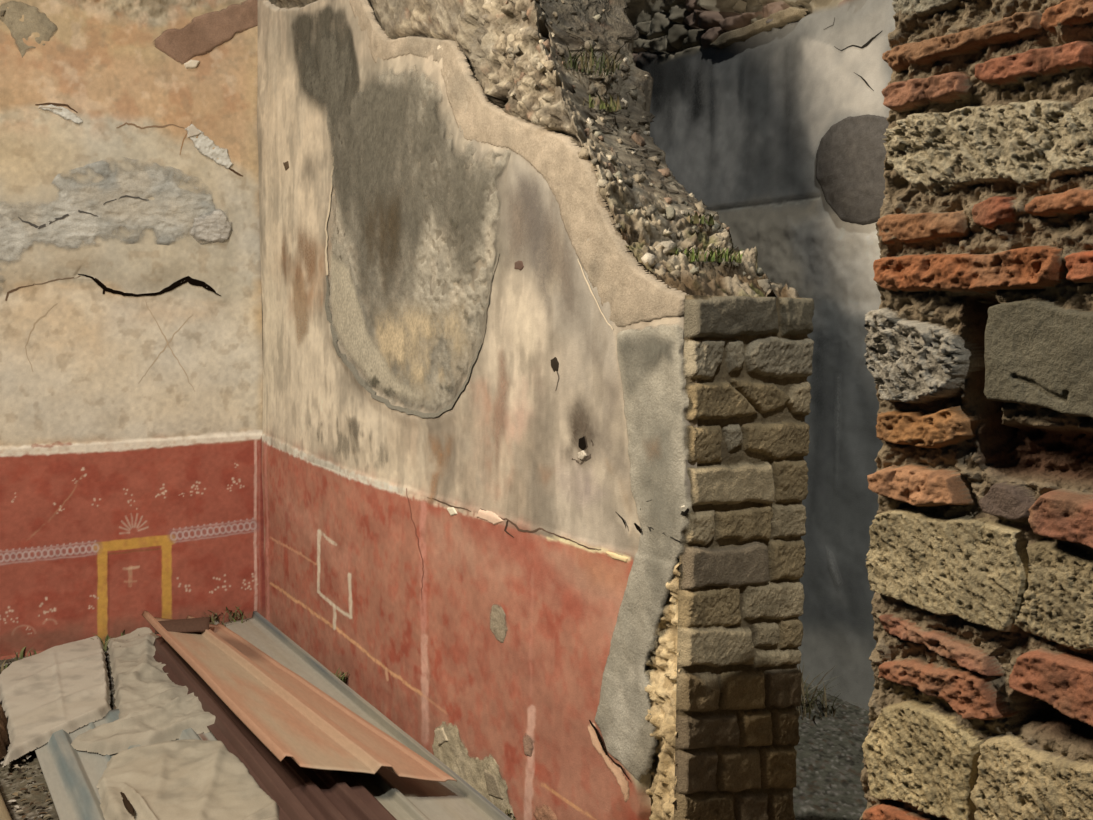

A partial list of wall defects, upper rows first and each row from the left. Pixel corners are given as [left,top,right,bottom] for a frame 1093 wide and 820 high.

spalling [0,1,58,58]
spalling [155,0,258,69]
spalling [0,159,233,261]
spalling [300,32,512,418]
crack [5,274,221,390]
crack [406,488,628,600]
crack [616,500,690,542]
spalling [432,721,514,819]
spalling [588,720,629,802]